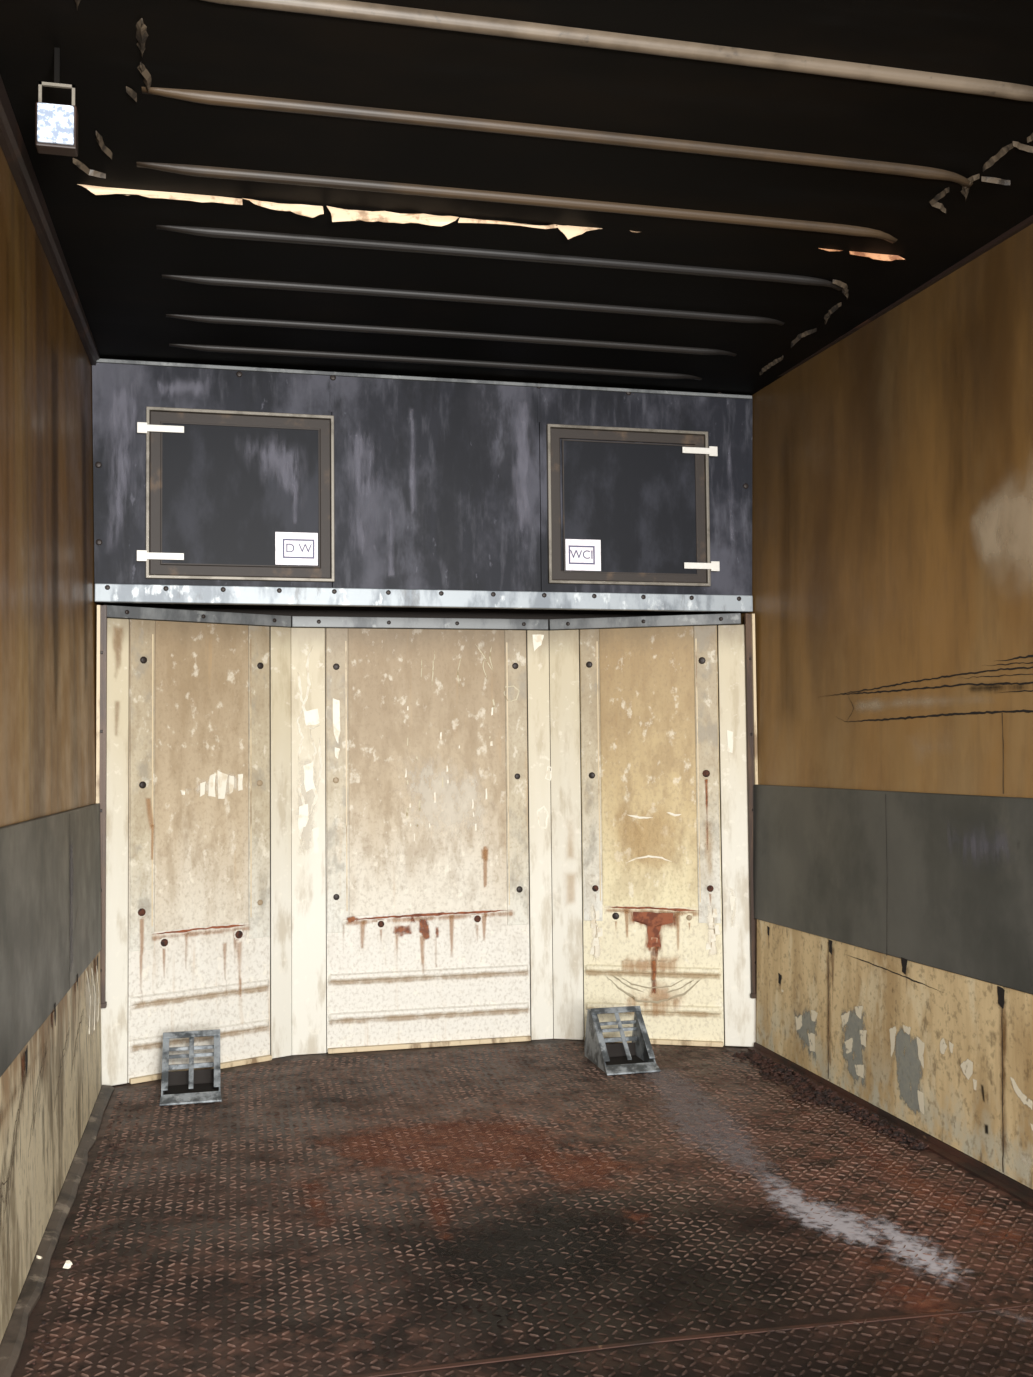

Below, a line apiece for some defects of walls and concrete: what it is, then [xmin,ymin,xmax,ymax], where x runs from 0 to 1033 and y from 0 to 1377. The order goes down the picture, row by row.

peeling [126,18,152,102]
peeling [73,131,602,240]
peeling [930,133,1033,213]
peeling [818,248,905,261]
corrosion [152,925,244,935]
corrosion [346,910,507,939]
corrosion [612,906,696,993]
peeling [795,1010,818,1057]
peeling [841,1006,867,1085]
peeling [889,1025,984,1115]
water stain [765,1176,955,1280]